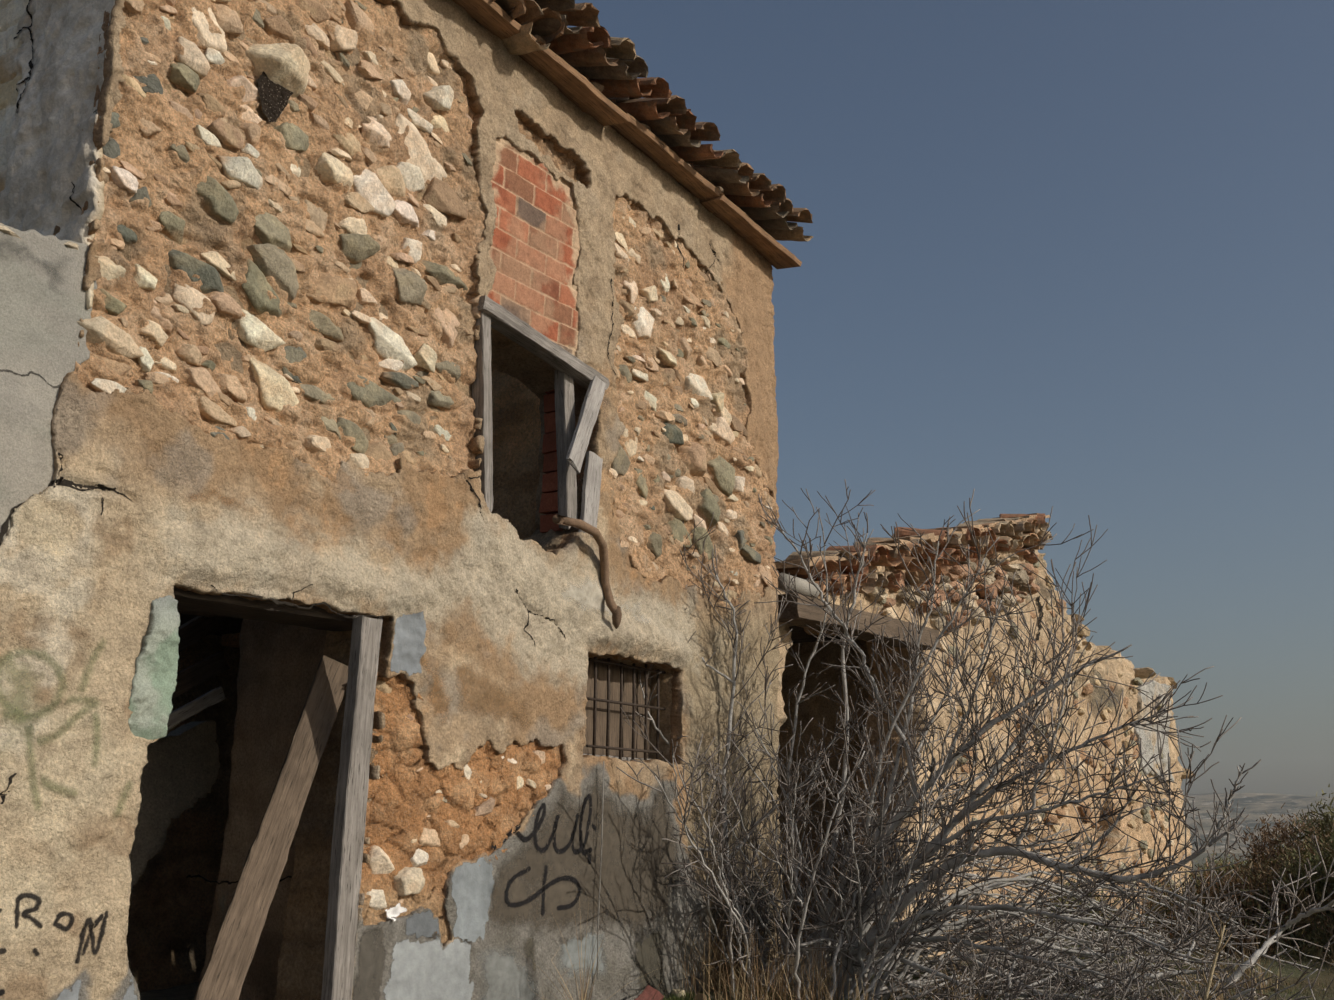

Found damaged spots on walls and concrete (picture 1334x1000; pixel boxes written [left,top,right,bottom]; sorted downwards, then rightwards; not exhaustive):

crack [14,0,33,113]
spalling [73,0,486,481]
crack [0,369,60,388]
spalling [607,196,780,612]
crack [0,449,132,545]
peeling [128,595,180,740]
crack [516,589,566,648]
spalling [358,611,562,1000]
peeling [123,979,137,1000]
peeling [561,934,604,974]